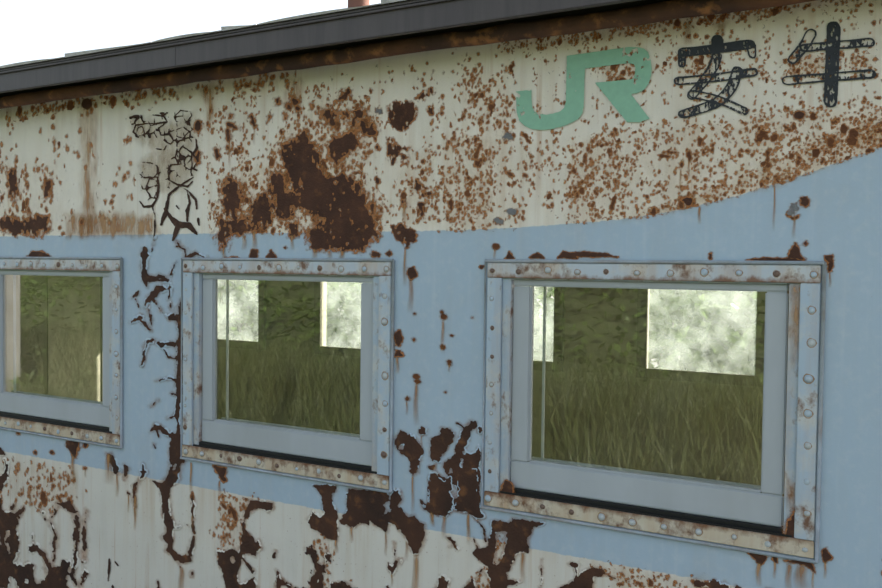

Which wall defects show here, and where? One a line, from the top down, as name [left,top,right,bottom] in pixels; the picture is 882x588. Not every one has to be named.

crack [129,110,200,252]
rust [0,0,882,291]
peeling [107,235,207,582]
rust [394,329,415,366]
rust [405,374,421,407]
peeling [0,448,89,588]
peeling [216,499,273,588]
peeling [274,421,546,588]
peeling [560,562,616,588]
peeling [694,579,741,588]